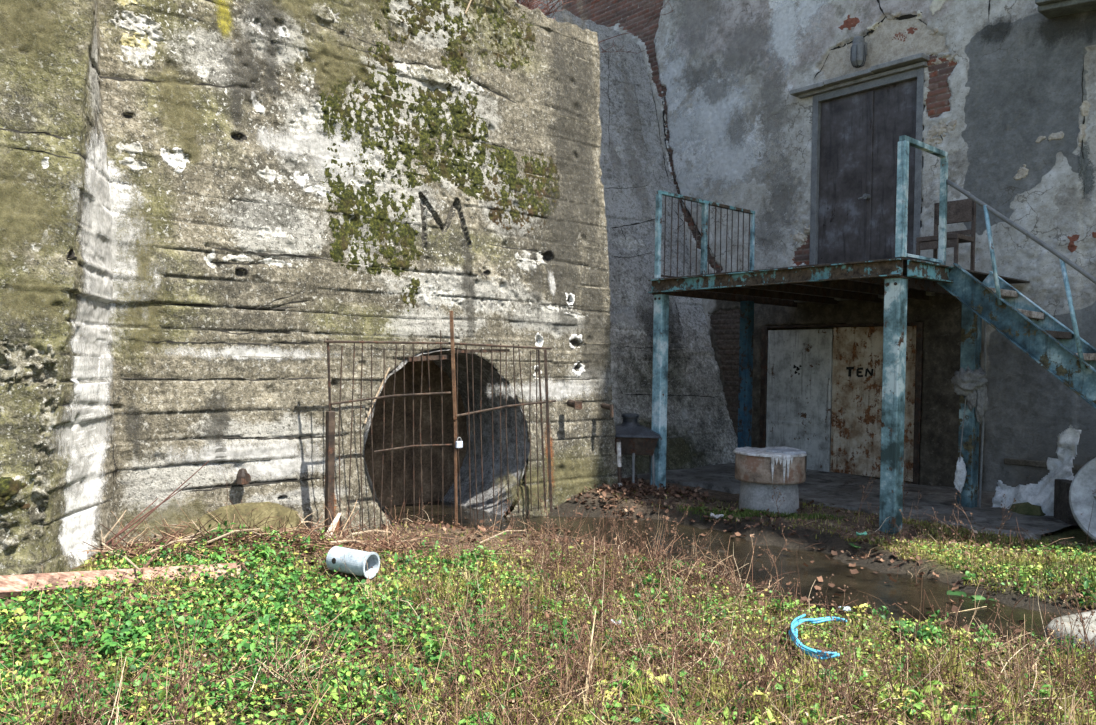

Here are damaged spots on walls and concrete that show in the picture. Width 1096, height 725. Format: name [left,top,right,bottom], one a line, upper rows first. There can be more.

water stain [218,0,283,123]
water stain [295,54,351,91]
flaking render [561,0,723,273]
crack [606,88,713,258]
crack [814,0,927,78]
flaking render [892,0,945,42]
flaking render [924,53,957,147]
crack [490,244,588,266]
flaking render [1067,232,1096,253]
spalling [537,299,588,319]